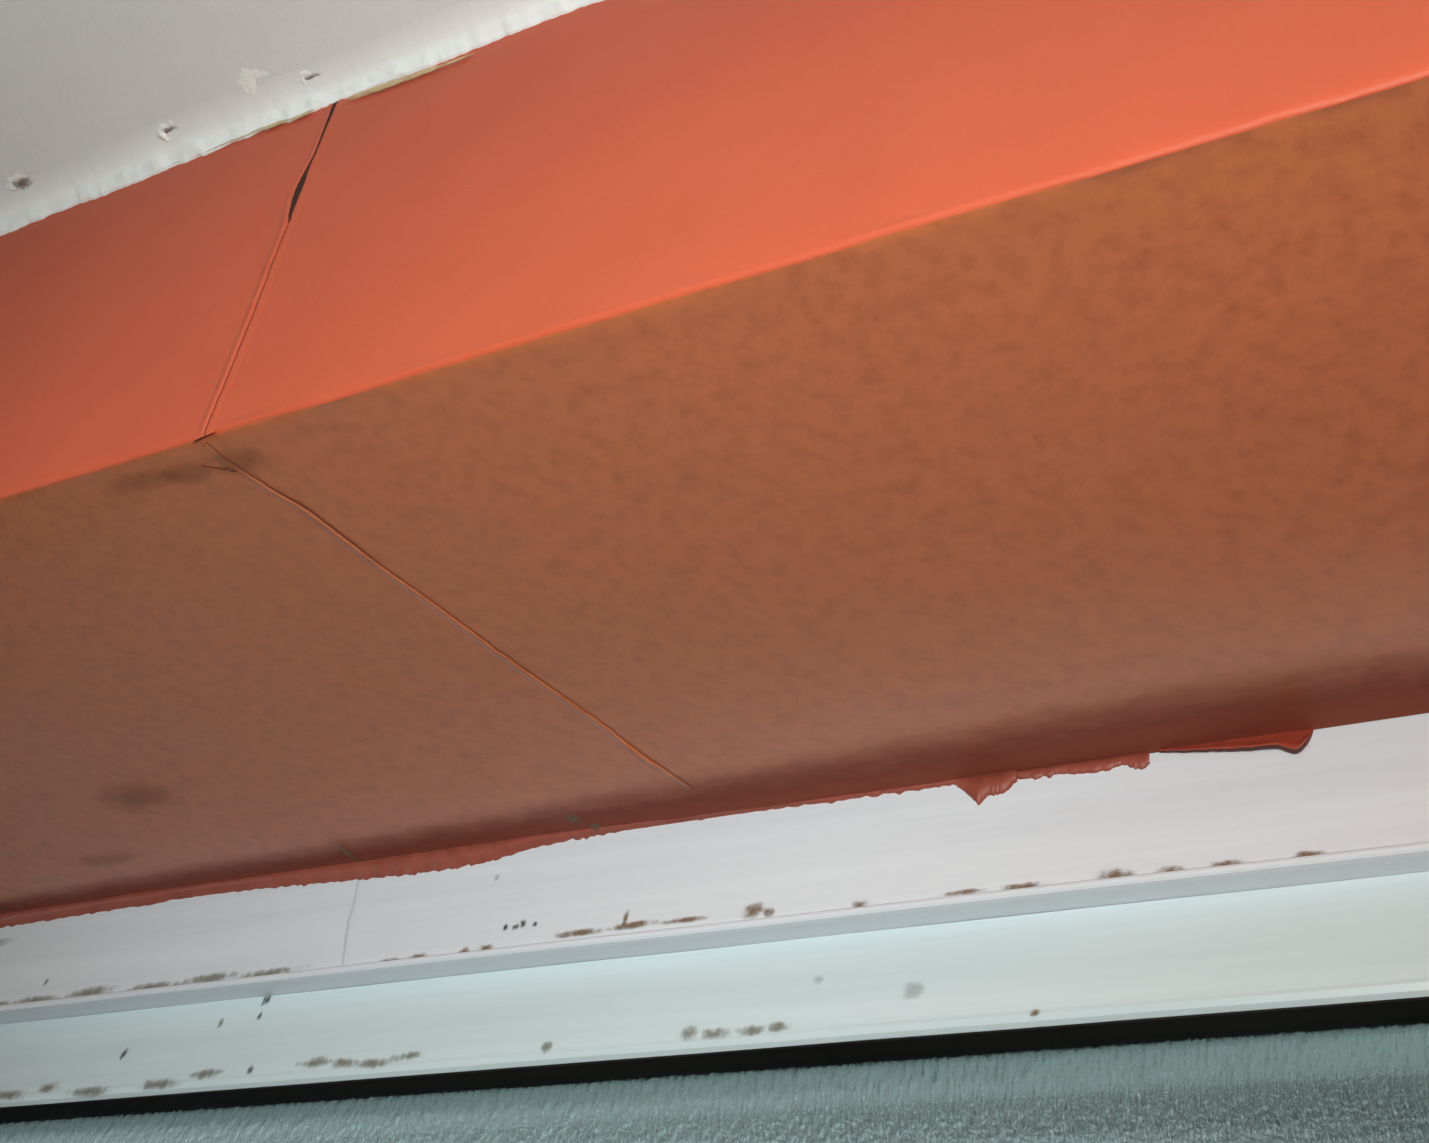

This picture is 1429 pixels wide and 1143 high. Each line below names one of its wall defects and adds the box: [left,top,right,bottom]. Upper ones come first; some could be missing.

crack [193,99,696,792]
peeling [1159,728,1314,751]
rust [616,914,644,929]
rust [747,905,773,916]